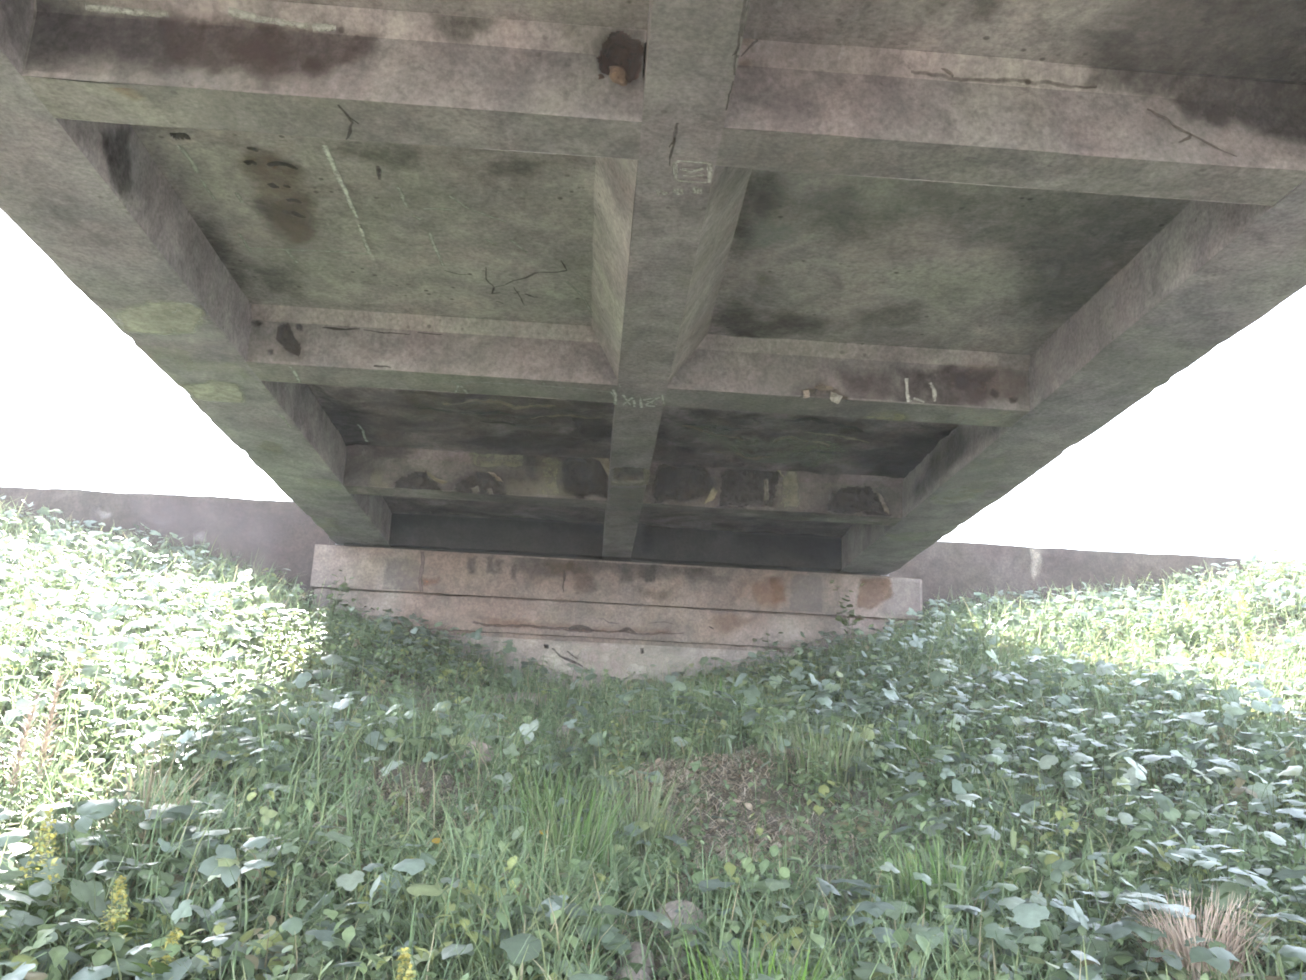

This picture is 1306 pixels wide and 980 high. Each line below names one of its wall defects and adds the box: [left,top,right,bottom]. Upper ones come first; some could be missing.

damp [35,0,370,72]
spalling [586,28,645,93]
crack [725,0,758,110]
crack [919,68,1094,88]
damp [1096,0,1306,141]
crack [1147,108,1237,157]
crack [445,261,567,304]
spalling [389,464,516,495]
spalling [549,457,650,500]
spalling [713,451,788,509]
spalling [822,480,896,516]